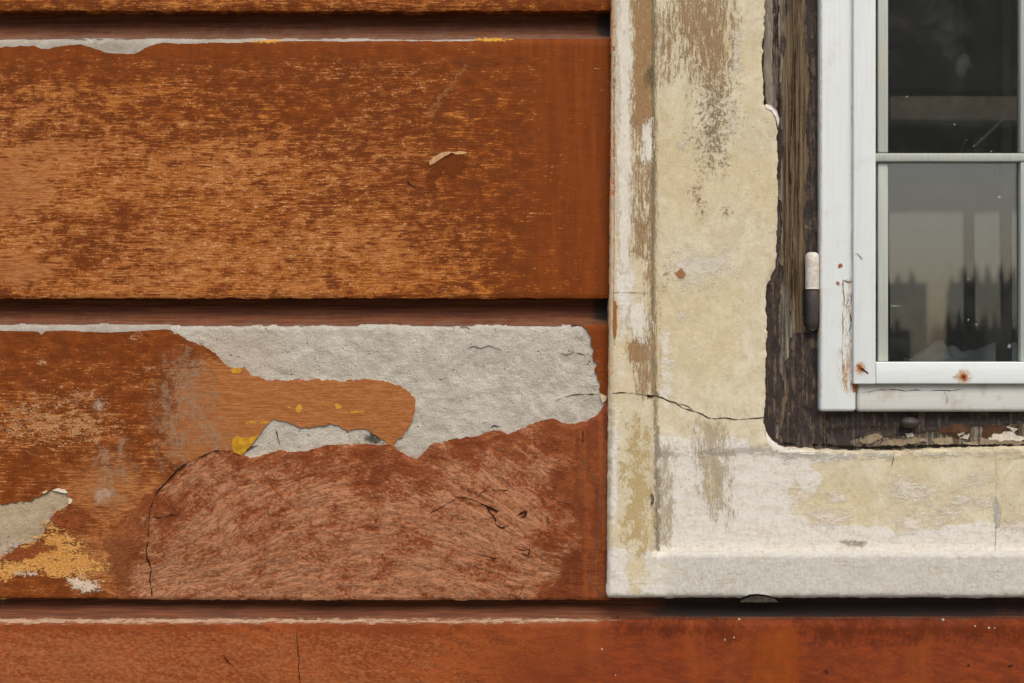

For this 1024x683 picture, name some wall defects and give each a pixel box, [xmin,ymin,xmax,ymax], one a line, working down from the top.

spalling [0,37,515,54]
peeling [407,150,469,195]
peeling [625,0,746,400]
peeling [765,0,791,182]
peeling [803,0,818,256]
spalling [0,323,607,459]
crack [613,392,767,420]
peeling [763,199,1024,455]
peeling [0,488,118,600]
crack [146,450,240,595]
crack [431,488,549,529]